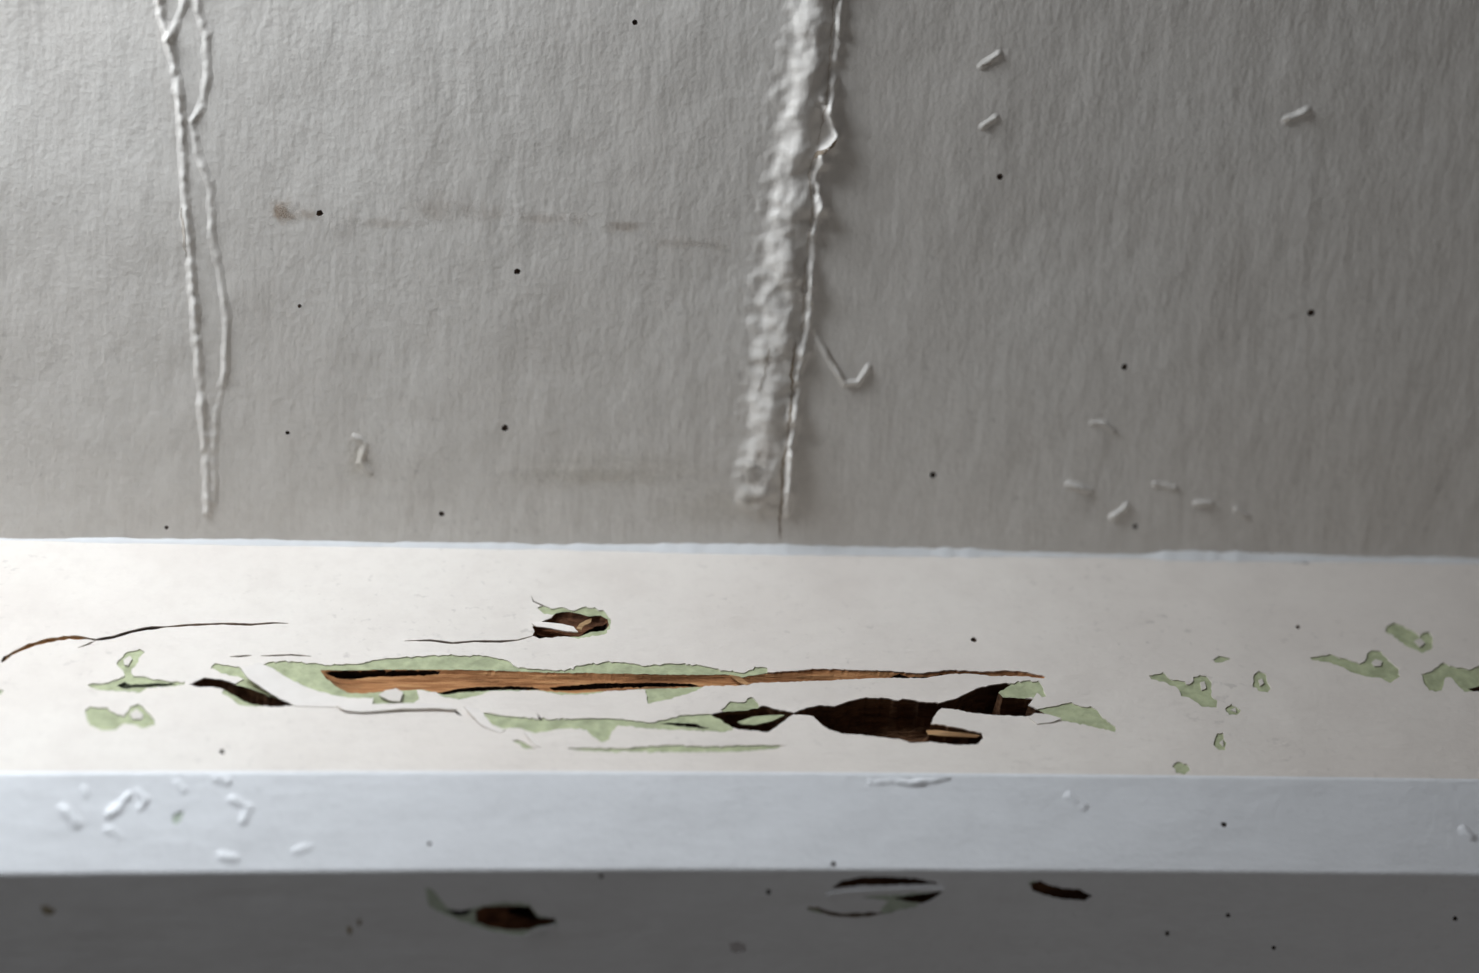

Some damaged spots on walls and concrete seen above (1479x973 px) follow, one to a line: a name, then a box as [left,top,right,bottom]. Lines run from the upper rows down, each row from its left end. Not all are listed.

crack [720,0,873,539]
spalling [531,607,611,639]
peeling [1386,623,1433,653]
peeling [85,650,785,753]
peeling [1150,657,1240,715]
peeling [1253,672,1270,692]
peeling [1311,651,1399,683]
peeling [1028,713,1062,725]
peeling [1213,734,1226,750]
peeling [807,877,942,917]
peeling [524,924,556,935]